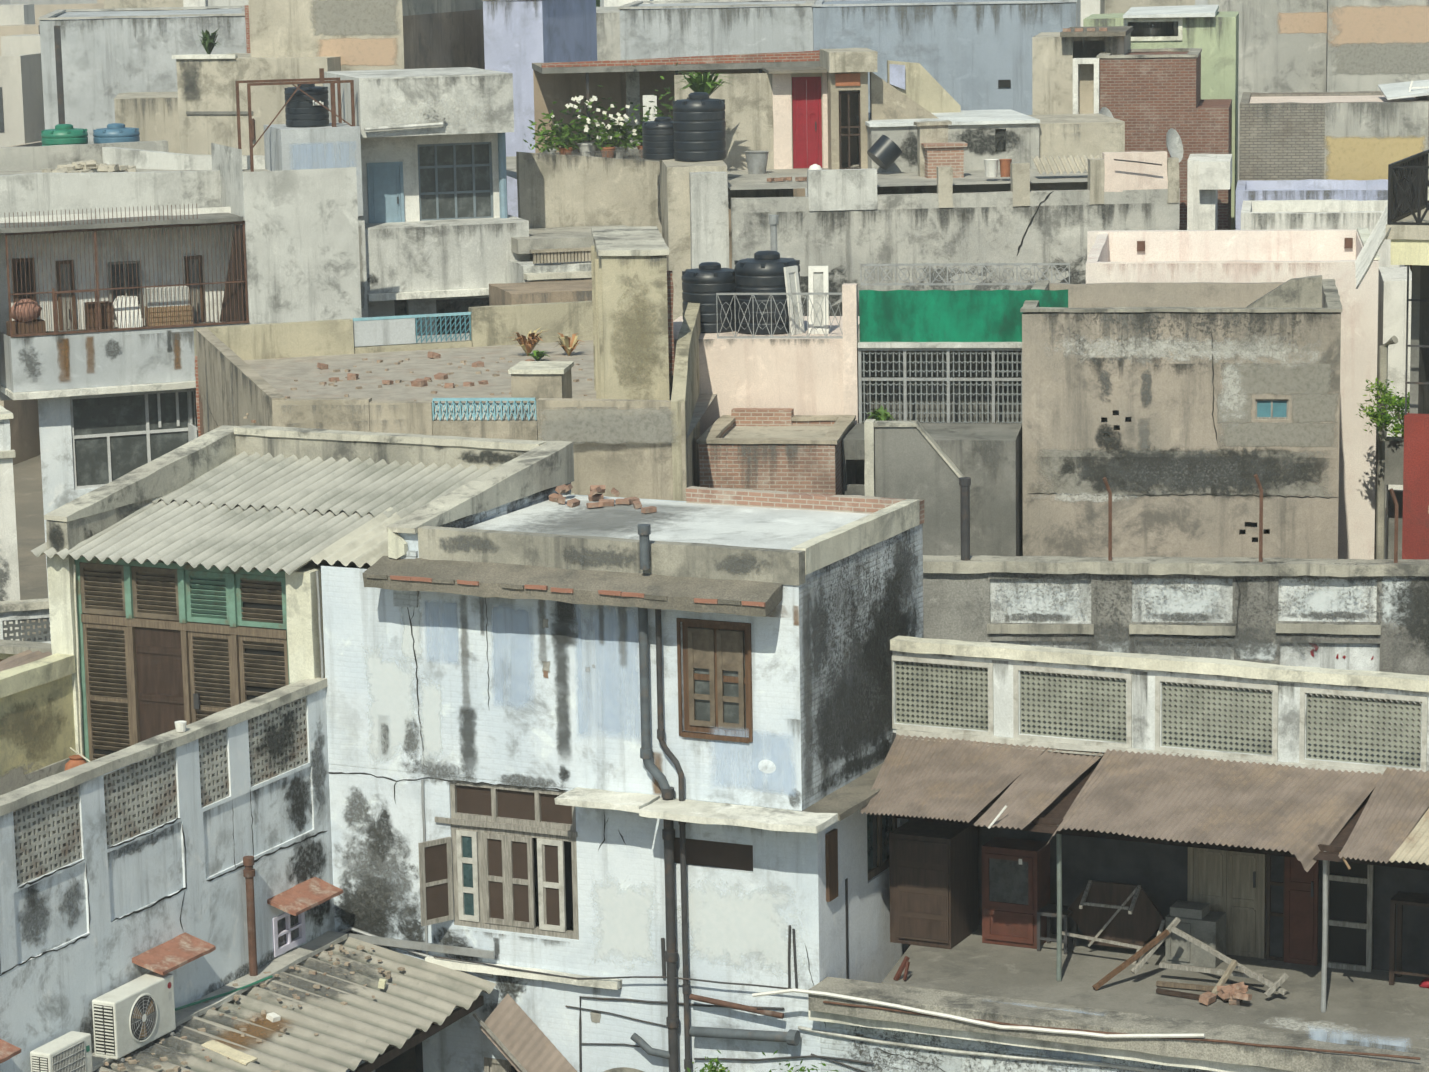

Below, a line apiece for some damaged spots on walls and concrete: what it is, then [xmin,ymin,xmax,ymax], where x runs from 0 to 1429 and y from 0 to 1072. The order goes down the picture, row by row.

damp [1039,312,1329,502]
crack [329,591,568,804]
damp [502,599,578,790]
damp [790,531,918,806]
damp [996,560,1429,697]
mould [19,878,81,953]
damp [108,822,179,857]
crack [0,791,327,976]
damp [253,704,326,884]
damp [205,789,559,1013]
damp [80,1010,95,1053]
damp [851,1026,943,1072]